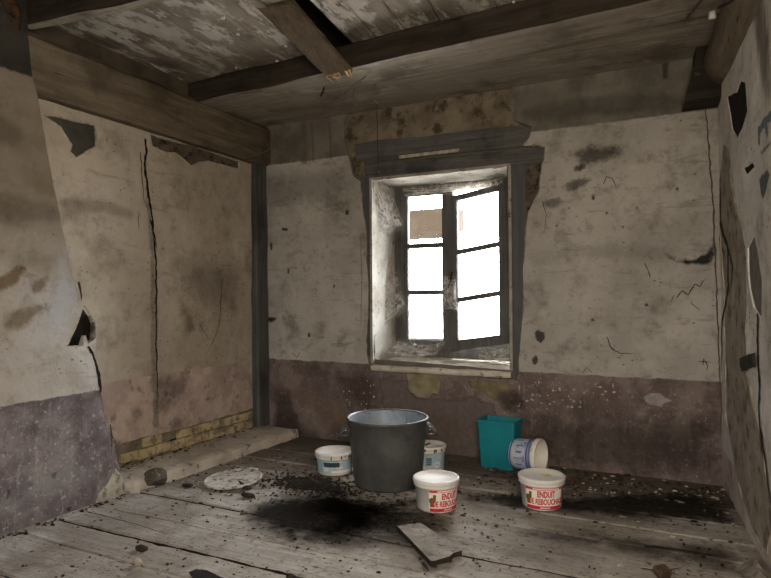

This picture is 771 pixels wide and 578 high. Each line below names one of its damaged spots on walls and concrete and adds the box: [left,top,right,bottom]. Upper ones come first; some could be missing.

spalling [728,81,747,138]
flaking render [43,114,97,157]
spalling [151,134,240,169]
damp [575,147,618,170]
spalling [343,88,616,409]
crack [671,109,733,430]
crack [138,139,176,448]
spalling [66,306,96,348]
flaking render [718,144,771,561]
peeling [644,393,676,407]
crack [110,424,139,464]